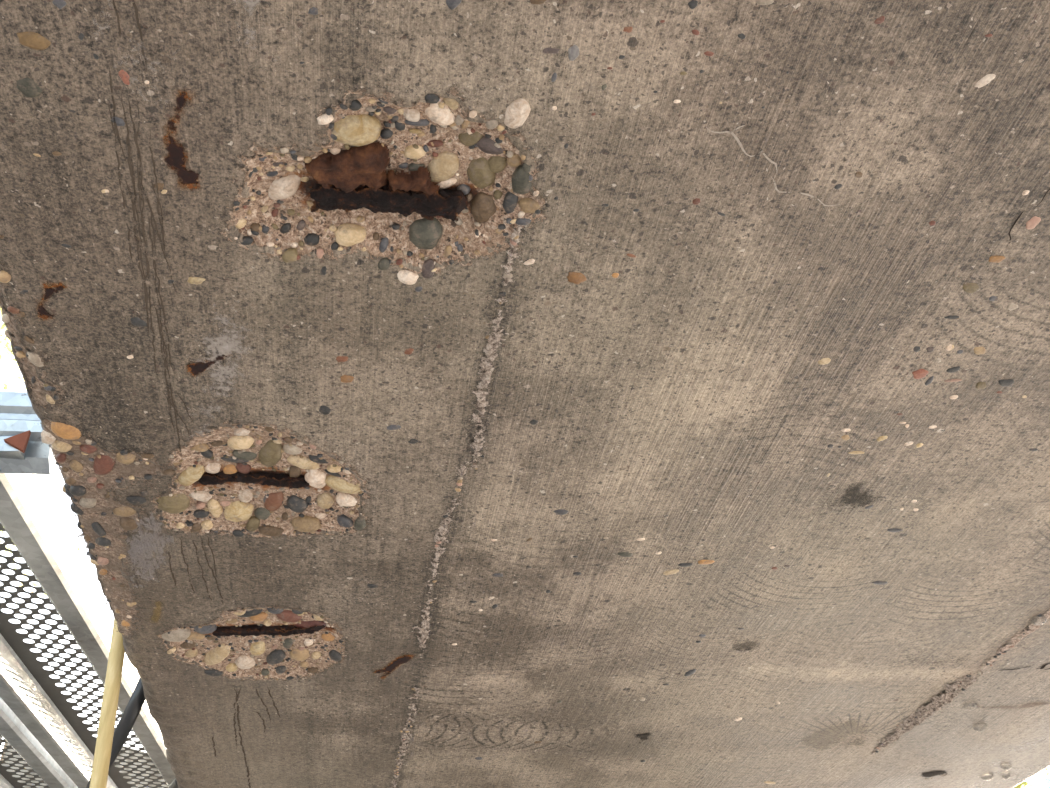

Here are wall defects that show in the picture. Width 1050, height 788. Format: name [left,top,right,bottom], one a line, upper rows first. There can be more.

rust [163,90,199,190]
crack [1006,189,1050,247]
rust [35,283,67,320]
rust [187,355,229,377]
spalling [218,79,553,656]
spalling [0,263,371,639]
spalling [156,604,349,682]
rust [373,655,413,679]
spalling [389,687,421,788]